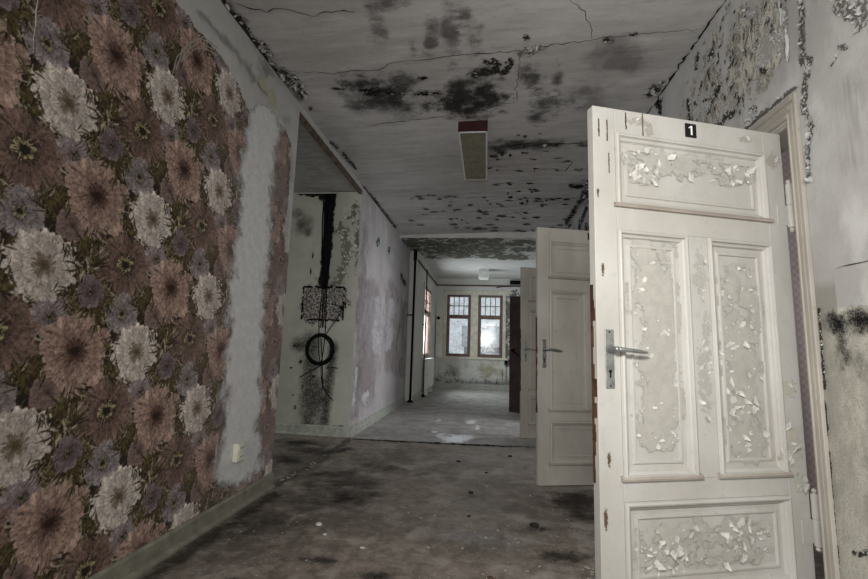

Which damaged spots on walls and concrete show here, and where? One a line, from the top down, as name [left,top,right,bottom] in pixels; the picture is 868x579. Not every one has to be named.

crack [236,3,355,17]
flaking render [830,0,868,33]
mould [350,76,413,111]
leakage [425,68,506,119]
crack [293,0,726,126]
flaking render [681,0,814,183]
flaking render [401,133,589,260]
flaking render [214,103,291,486]
flaking render [300,200,361,325]
leakage [827,311,868,361]
leakage [312,345,337,425]
peeling [635,517,771,577]